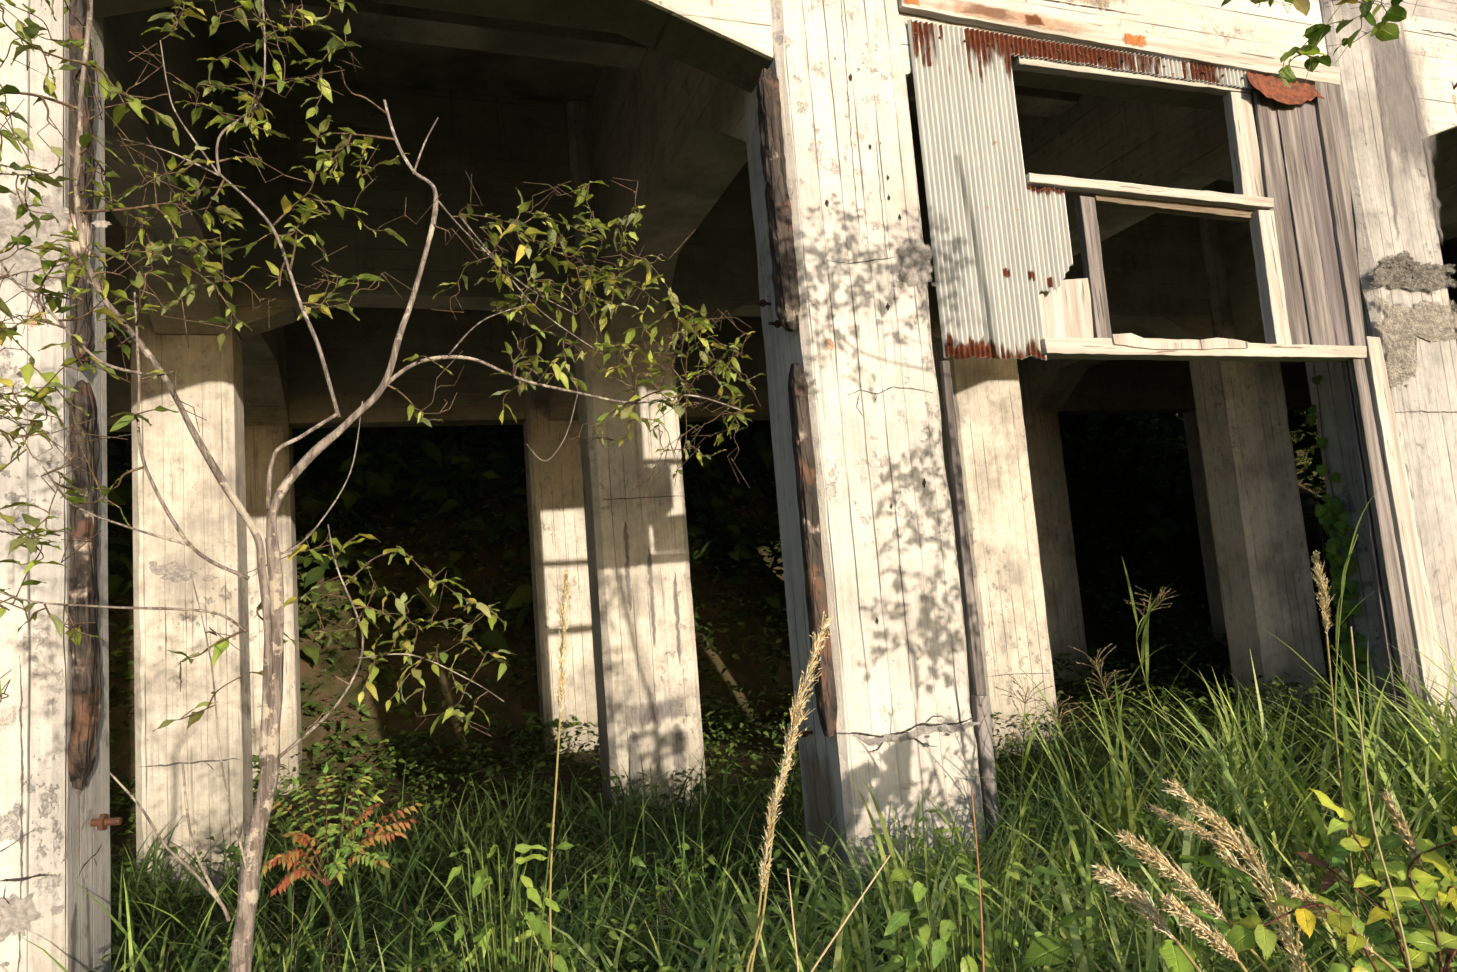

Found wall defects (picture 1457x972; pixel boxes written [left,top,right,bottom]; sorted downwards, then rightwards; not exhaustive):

rust [904,0,943,66]
rust [956,1,1225,84]
crack [841,1,888,260]
rust [1246,71,1325,105]
spalling [829,237,937,296]
rust [944,334,1046,360]
spalling [1367,251,1457,390]
damp [624,523,632,609]
damp [648,550,656,645]
crack [835,496,980,752]